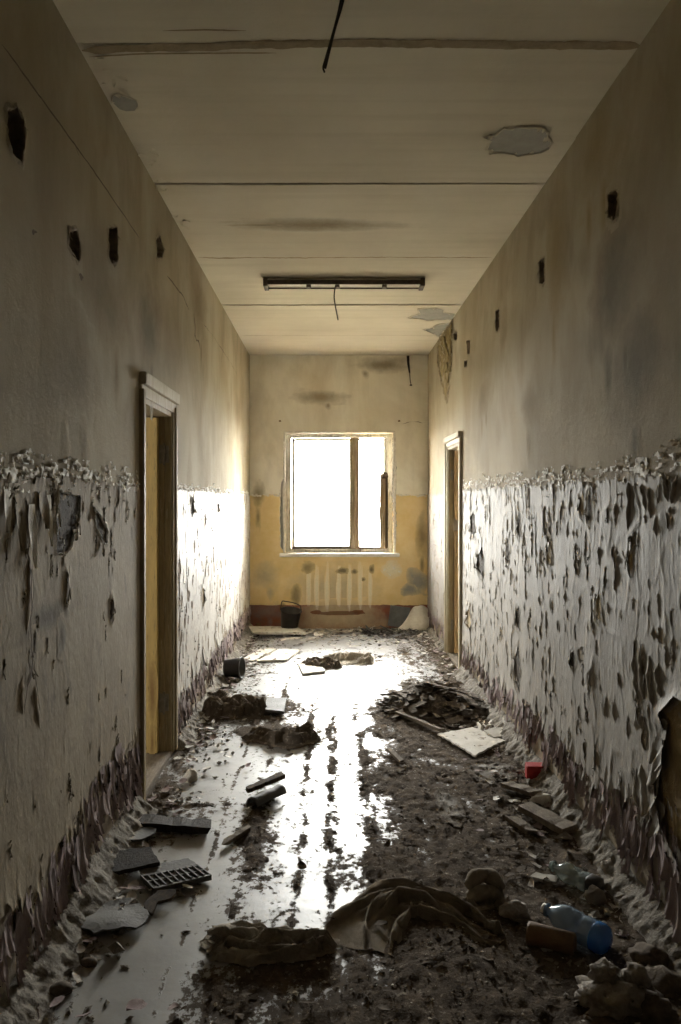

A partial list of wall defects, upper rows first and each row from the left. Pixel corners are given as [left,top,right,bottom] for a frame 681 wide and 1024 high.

hole [3,101,28,171]
peeling [483,126,554,158]
hole [67,225,83,281]
hole [106,222,120,267]
damp [199,217,436,233]
hole [605,187,619,226]
flaking render [406,308,471,404]
peeling [178,438,444,737]
damp [250,558,394,629]
peeling [0,448,144,1003]
peeling [460,439,681,943]